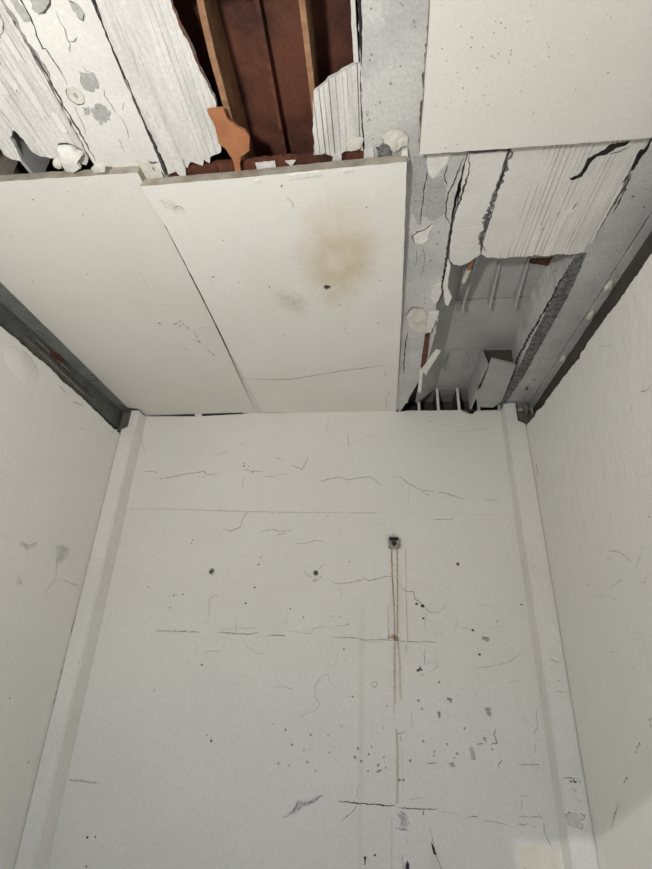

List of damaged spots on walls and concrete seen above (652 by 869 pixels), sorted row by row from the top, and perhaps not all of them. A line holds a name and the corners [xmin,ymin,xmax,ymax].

peeling [10,0,51,22]
peeling [82,103,111,125]
flaking render [135,158,186,179]
peeling [207,107,250,172]
spalling [255,160,322,187]
flaking render [332,128,408,173]
peeling [411,156,446,225]
spalling [400,260,452,403]
crack [242,458,497,520]
crack [171,509,356,544]
crack [155,576,471,675]
crack [337,786,552,869]